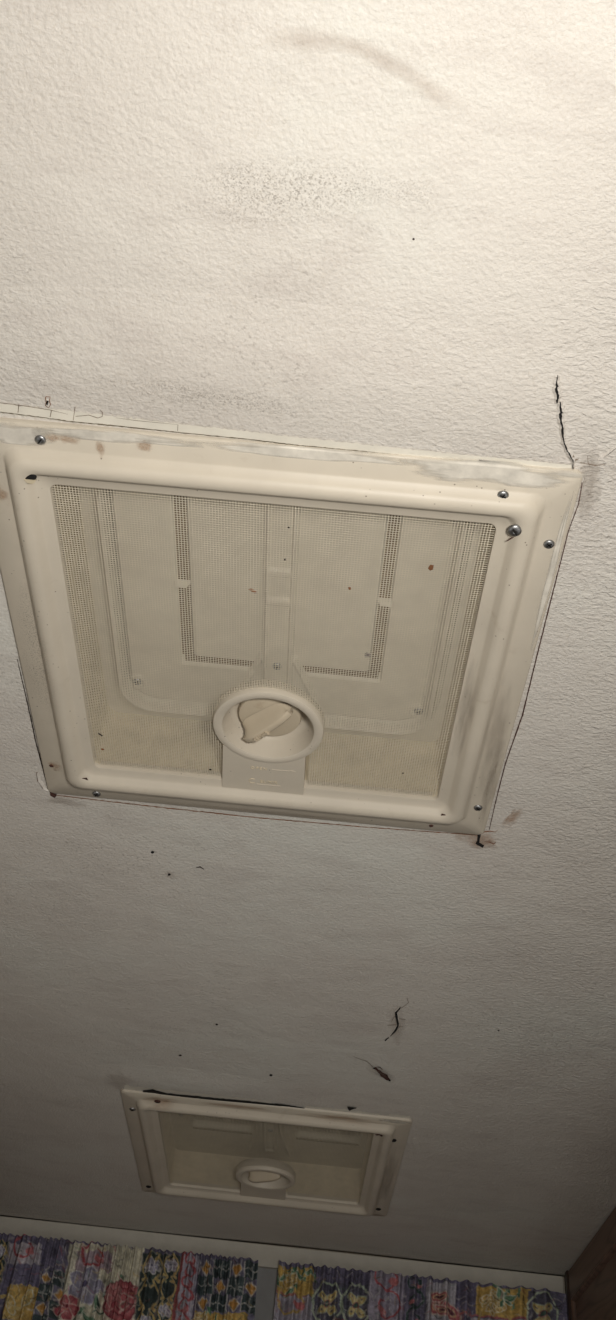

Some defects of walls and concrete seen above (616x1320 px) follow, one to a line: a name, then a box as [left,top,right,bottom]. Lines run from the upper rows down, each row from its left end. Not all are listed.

crack [552,374,616,483]
crack [385,999,409,1041]